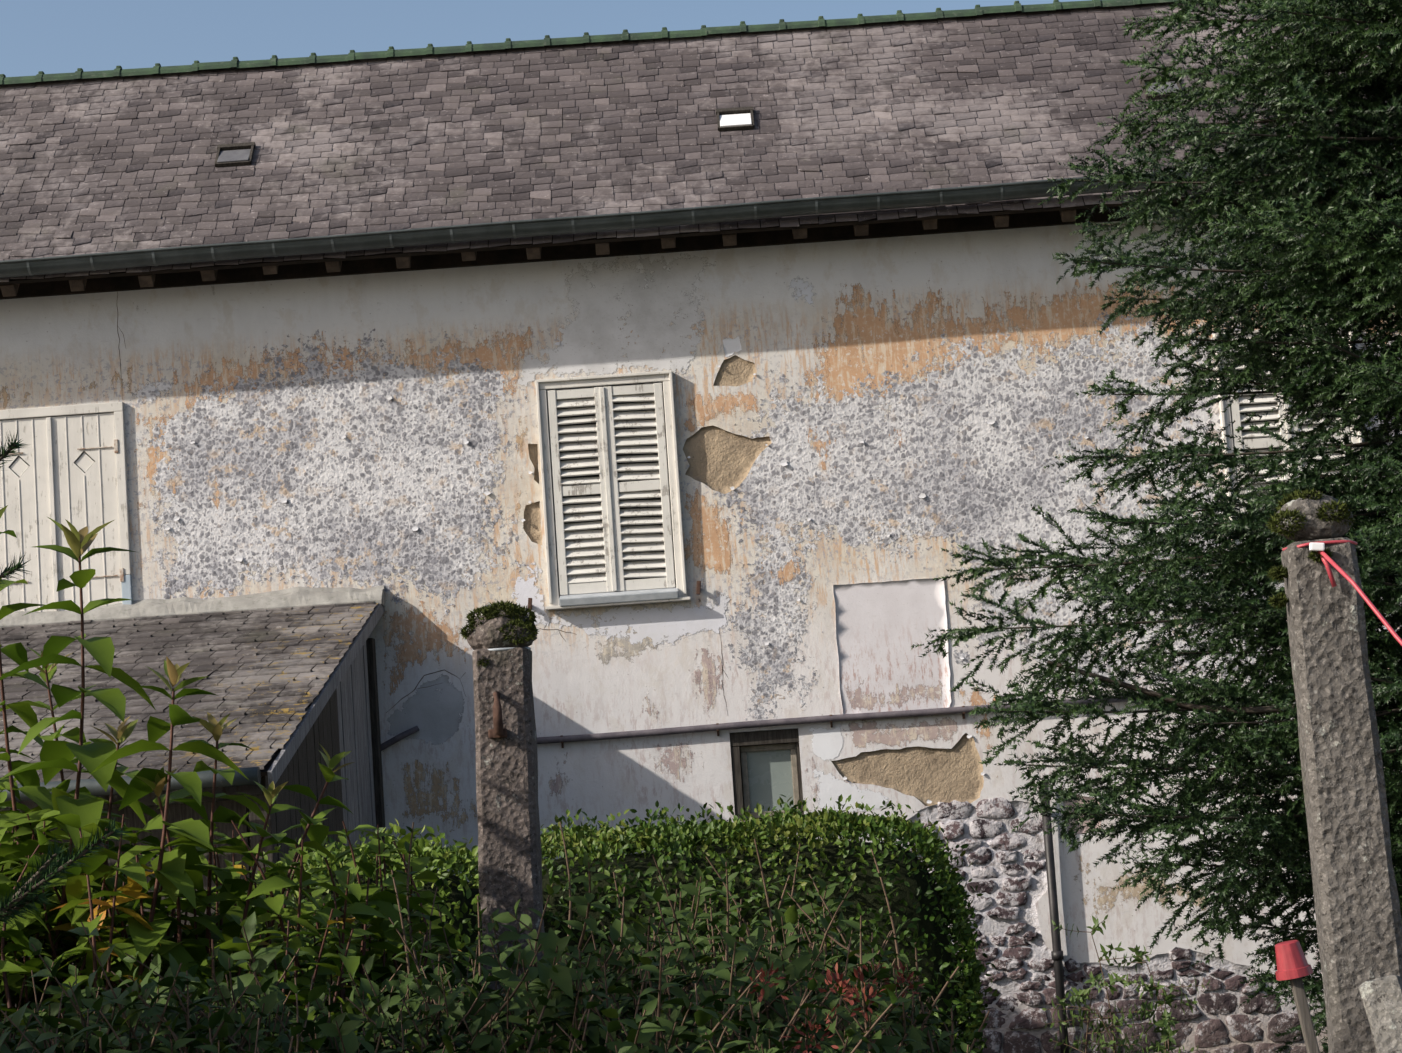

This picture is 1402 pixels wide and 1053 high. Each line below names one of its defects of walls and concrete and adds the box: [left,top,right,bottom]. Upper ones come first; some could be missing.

peeling [128,329,542,617]
water stain [134,327,554,507]
water stain [771,559,801,586]
water stain [808,426,836,470]
peeling [683,310,1289,720]
spalling [831,717,985,806]